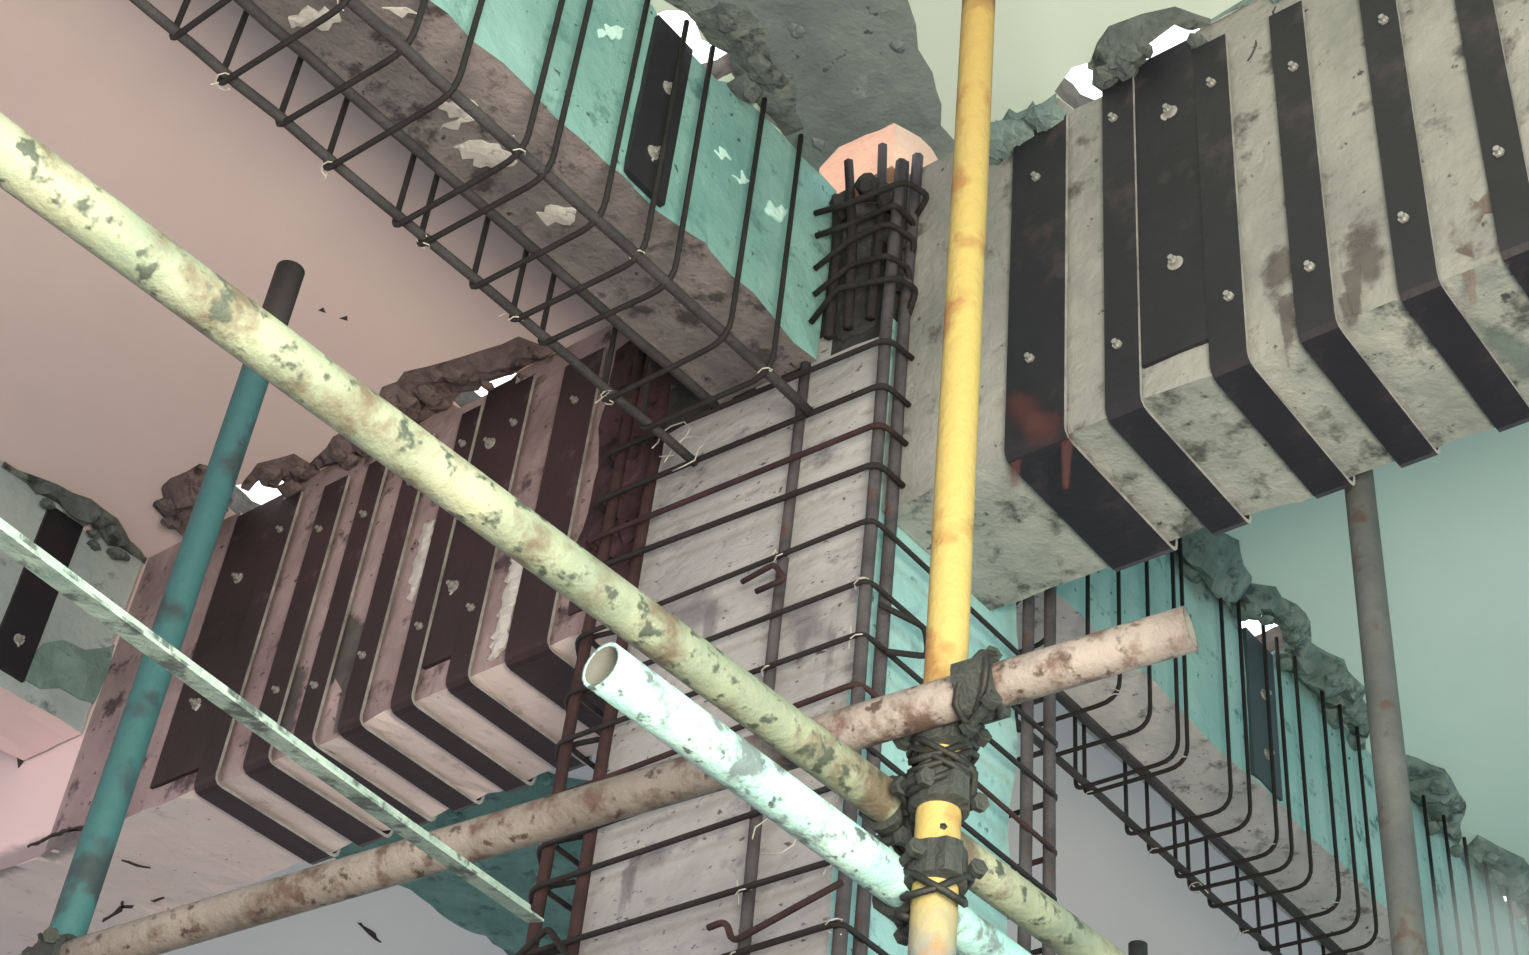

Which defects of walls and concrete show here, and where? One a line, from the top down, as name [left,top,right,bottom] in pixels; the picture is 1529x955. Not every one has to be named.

spalling [665,0,954,173]
spalling [1088,0,1253,91]
peeling [714,146,750,185]
peeling [763,200,788,223]
spalling [829,172,908,343]
spalling [379,336,554,424]
spalling [153,464,207,536]
spalling [226,434,370,512]
corrosion [1015,399,1071,486]
spalling [1176,527,1369,750]
spalling [1406,754,1529,913]